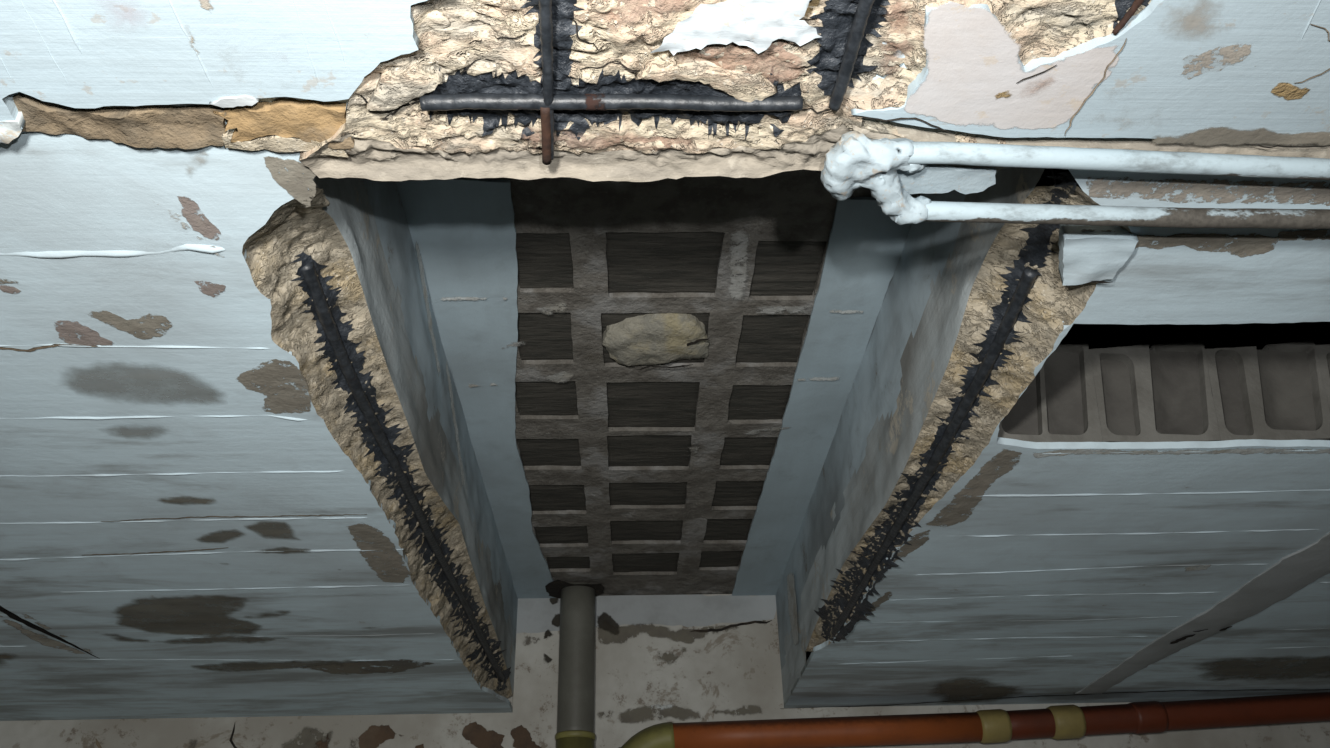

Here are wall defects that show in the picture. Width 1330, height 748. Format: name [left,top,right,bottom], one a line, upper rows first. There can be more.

crack [1296,24,1330,83]
spalling [13,0,1151,698]
leakage [71,366,216,402]
spalling [806,223,1330,652]
crack [0,606,98,658]
leakage [110,596,288,644]
leakage [194,659,434,674]
leakage [1204,656,1330,680]
peeling [351,725,401,748]
peeling [462,722,541,748]